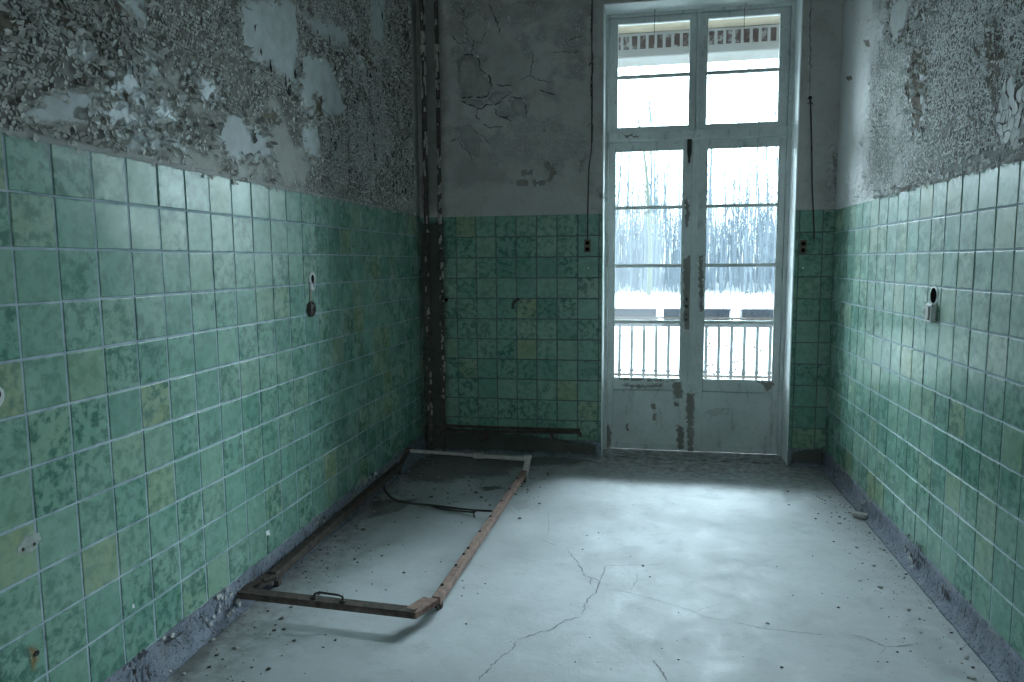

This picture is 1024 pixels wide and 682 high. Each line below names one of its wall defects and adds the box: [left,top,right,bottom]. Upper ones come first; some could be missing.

flaking render [0,0,443,249]
crack [450,4,594,159]
peeling [823,0,1024,212]
crack [478,515,825,681]